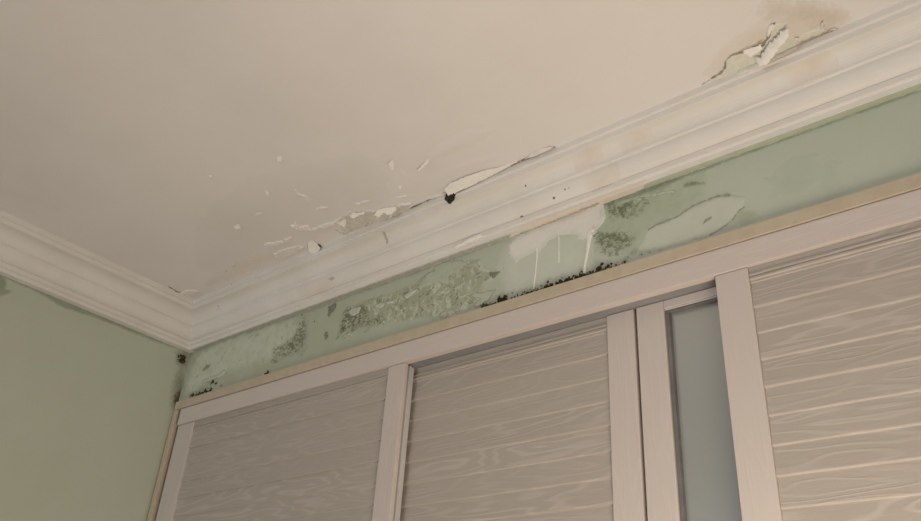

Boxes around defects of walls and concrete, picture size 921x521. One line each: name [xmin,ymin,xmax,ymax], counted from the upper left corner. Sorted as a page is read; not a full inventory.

peeling [702,22,836,85]
peeling [335,146,554,235]
water stain [480,125,708,308]
flaking render [324,234,500,341]
peeling [184,314,315,396]